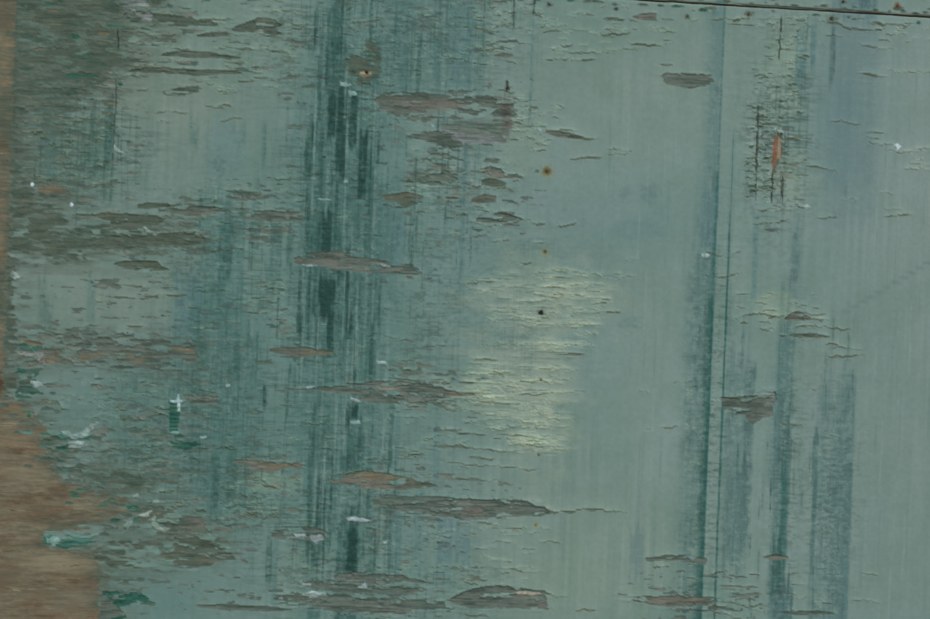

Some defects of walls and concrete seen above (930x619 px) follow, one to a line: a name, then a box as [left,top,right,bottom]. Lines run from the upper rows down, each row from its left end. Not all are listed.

peeling [343,41,385,86]
peeling [660,70,715,89]
peeling [372,87,520,150]
peeling [292,250,424,276]
peeling [0,0,307,619]
peeling [722,388,778,427]
peeling [329,472,550,521]
peeling [271,526,330,546]
peeling [197,569,550,615]